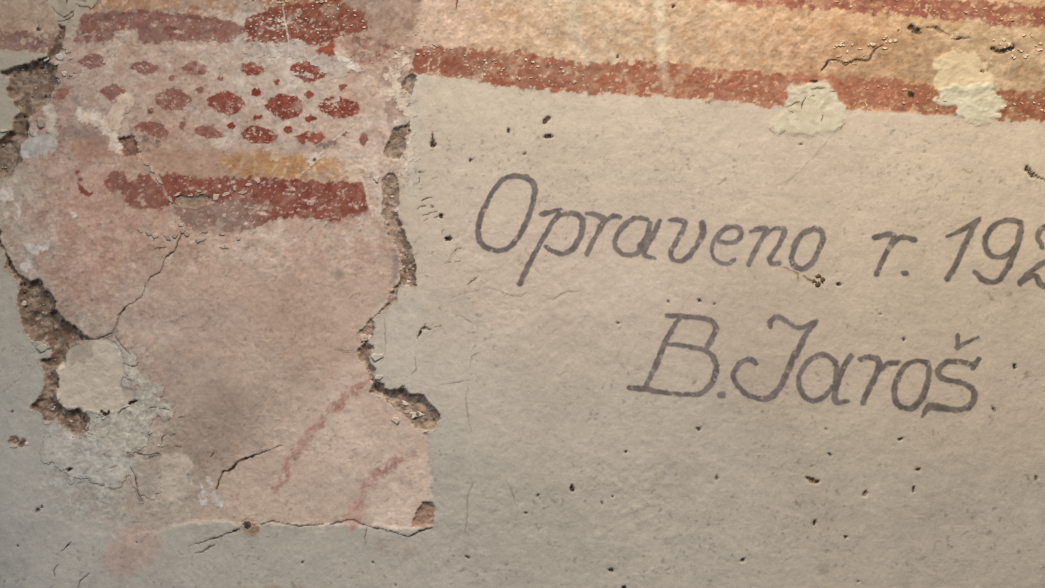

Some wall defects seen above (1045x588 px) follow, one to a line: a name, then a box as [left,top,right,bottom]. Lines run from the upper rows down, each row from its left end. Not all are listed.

peeling [244,0,366,42]
spalling [0,23,76,180]
spalling [116,133,163,185]
spalling [168,179,260,210]
crack [85,233,182,368]
spalling [0,229,114,438]
spalling [7,434,29,448]
crack [99,406,185,503]
crack [208,445,283,491]
hole [240,517,261,538]
spalling [410,501,436,528]
crack [53,541,90,588]